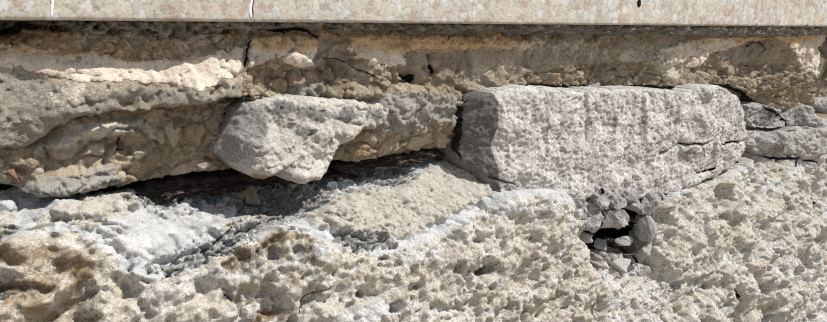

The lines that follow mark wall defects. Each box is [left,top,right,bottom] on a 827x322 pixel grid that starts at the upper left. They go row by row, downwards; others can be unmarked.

crack [244,1,318,68]
crack [331,58,388,79]
crack [518,82,674,90]
crack [659,84,787,173]
crack [760,155,818,167]
spalling [578,186,643,279]
water stain [4,280,53,303]